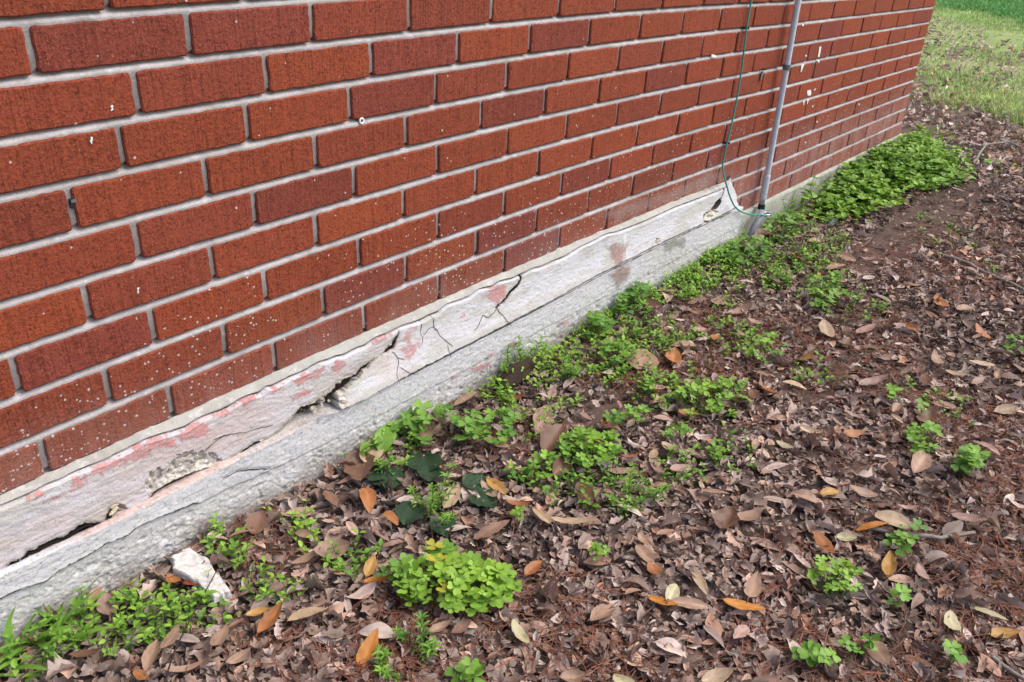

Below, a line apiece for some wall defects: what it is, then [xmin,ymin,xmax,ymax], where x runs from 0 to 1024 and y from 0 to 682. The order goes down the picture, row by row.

crack [1,184,731,505]
spalling [26,360,347,504]
spalling [109,503,129,516]